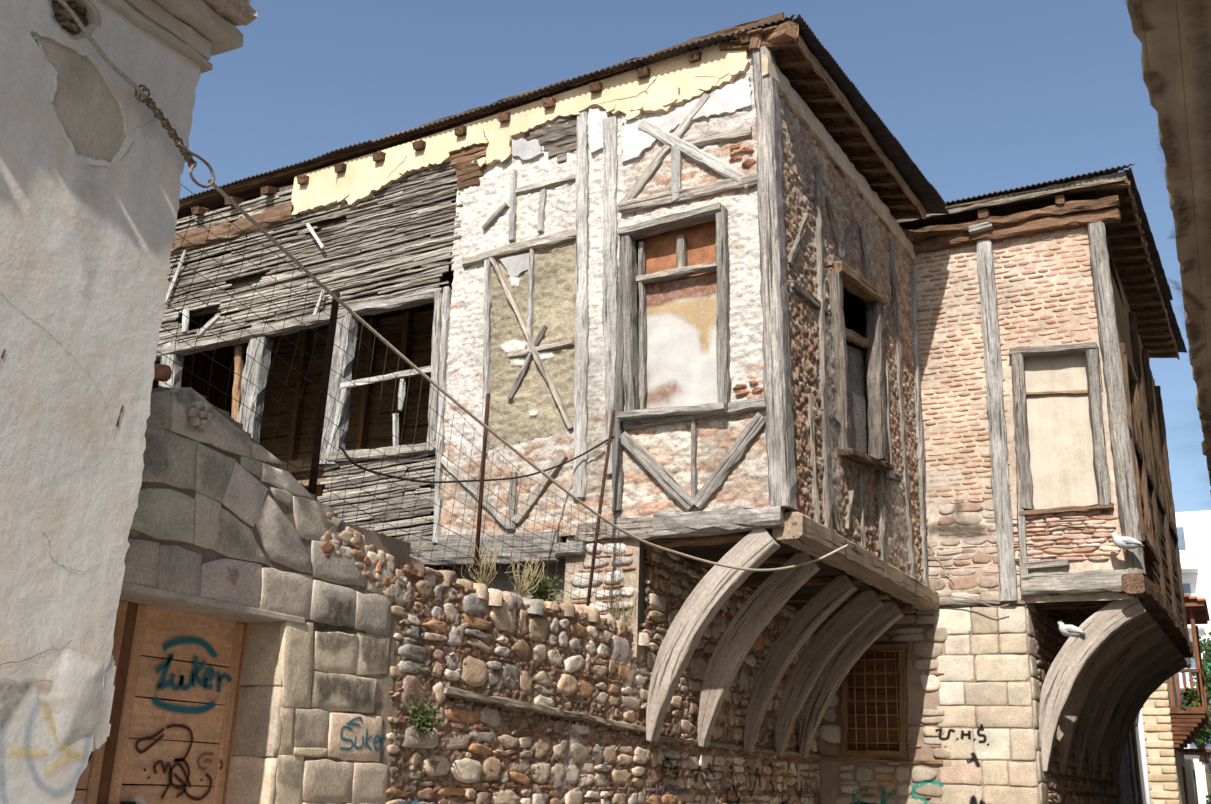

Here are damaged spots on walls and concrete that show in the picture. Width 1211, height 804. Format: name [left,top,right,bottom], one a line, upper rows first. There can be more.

flaking render [25,0,133,168]
peeling [605,103,644,120]
peeling [477,146,511,167]
peeling [729,145,757,168]
peeling [733,380,763,399]